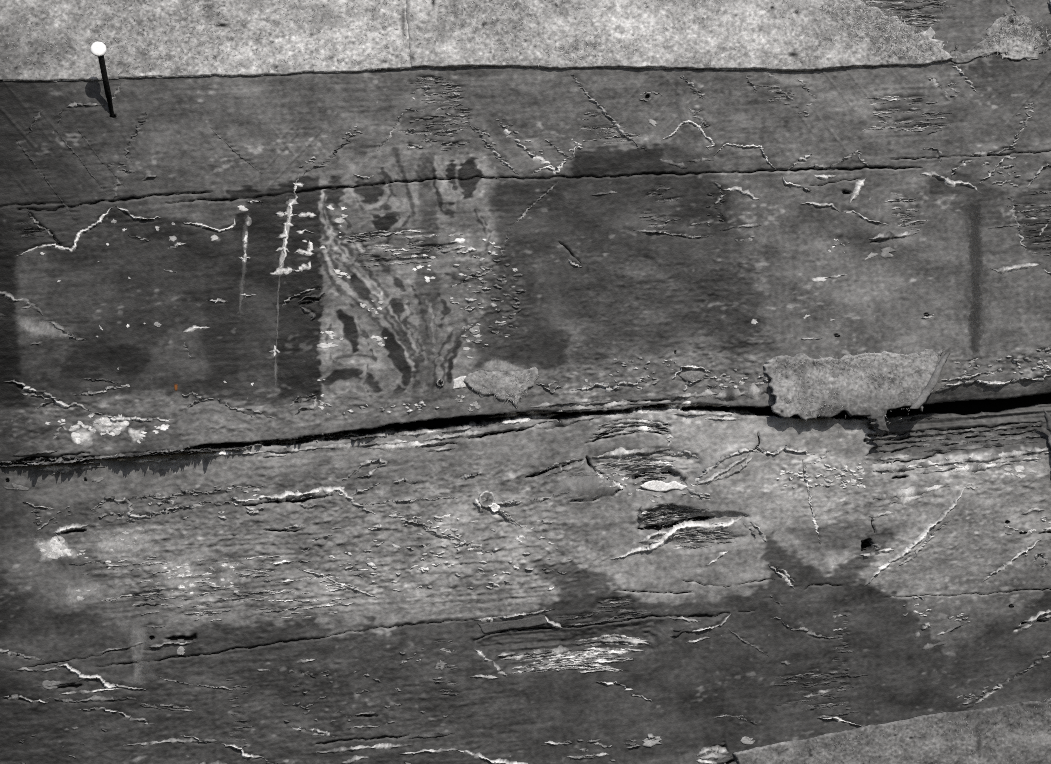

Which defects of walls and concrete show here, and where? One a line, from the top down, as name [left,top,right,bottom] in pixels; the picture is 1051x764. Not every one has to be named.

crack [2,150,1051,211]
damp [460,182,558,284]
peeling [343,400,439,415]
peeling [453,376,481,411]
peeling [671,433,1051,589]
damp [970,650,1050,707]